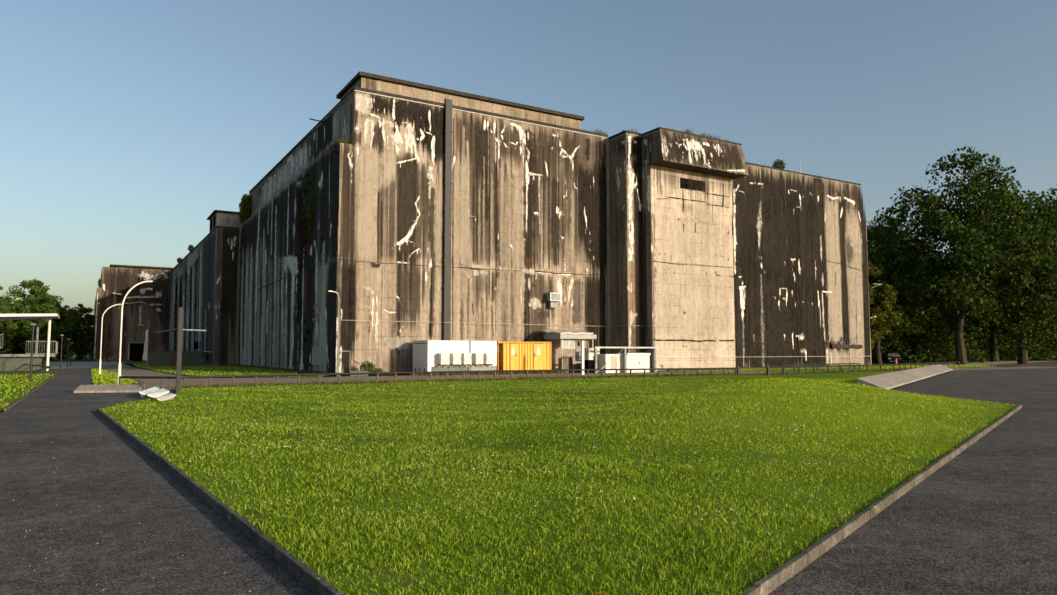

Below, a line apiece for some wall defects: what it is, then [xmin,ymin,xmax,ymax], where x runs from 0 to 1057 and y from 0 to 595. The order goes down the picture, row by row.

water stain [94,94,871,373]
peeling [465,141,588,310]